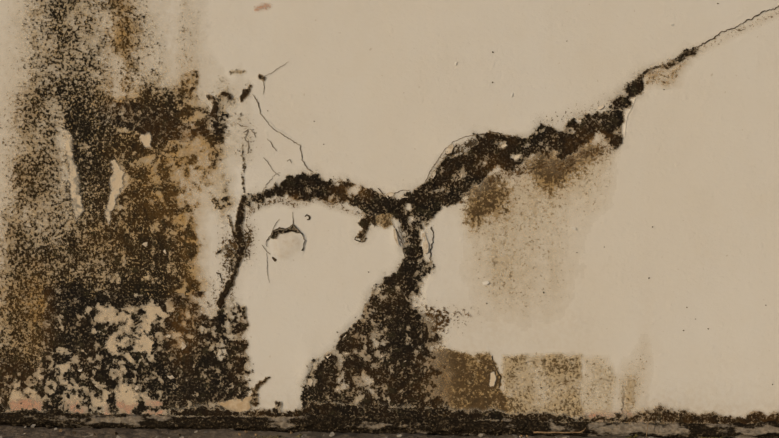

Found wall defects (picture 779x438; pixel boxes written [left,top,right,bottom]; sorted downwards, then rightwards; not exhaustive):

crack [211,5,779,320]
water stain [459,143,610,309]
water stain [271,401,282,416]
water stain [503,353,590,418]
water stain [618,374,640,414]